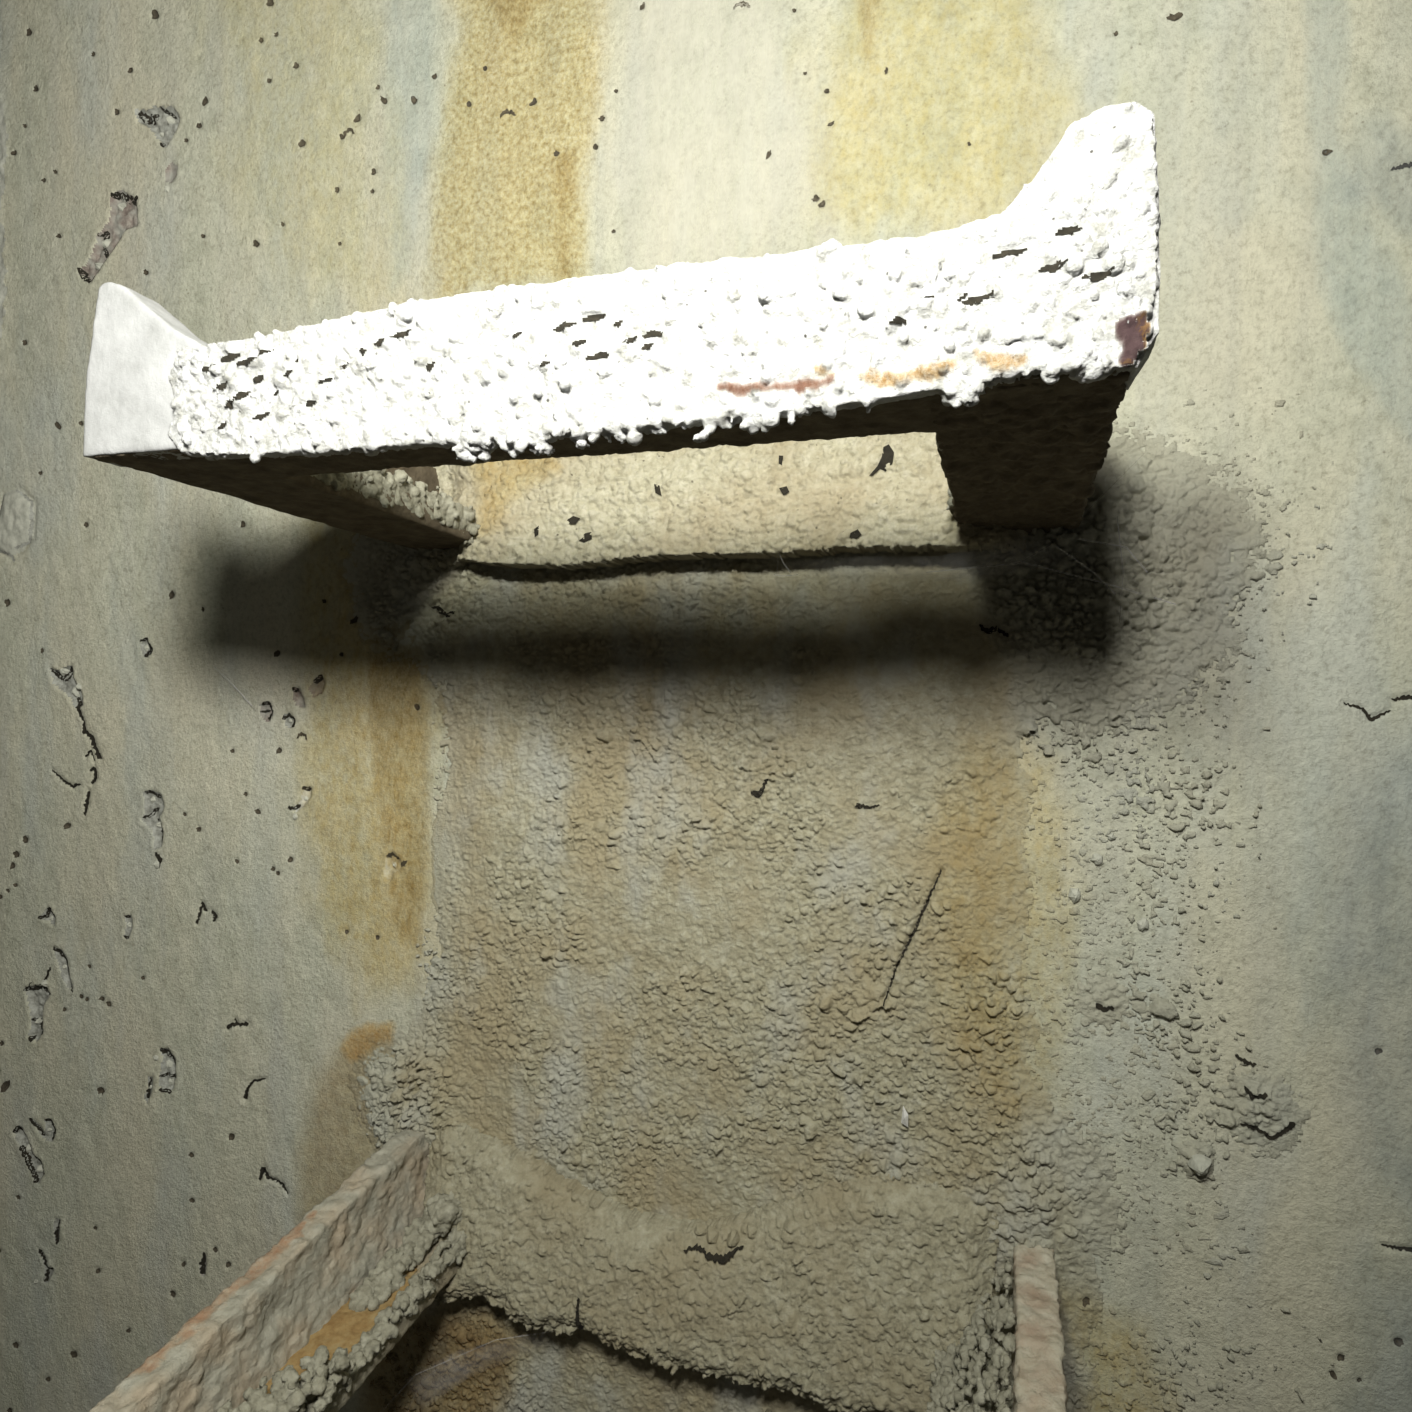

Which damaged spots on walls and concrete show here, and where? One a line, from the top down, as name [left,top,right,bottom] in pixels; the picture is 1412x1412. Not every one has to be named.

spalling [135,105,180,193]
crack [1391,161,1412,170]
spalling [77,190,138,283]
damp [168,101,1161,463]
rust [1117,314,1148,365]
crack [1343,695,1412,721]
crack [52,697,102,816]
spalling [142,790,164,869]
crack [883,870,942,1006]
spalling [23,947,73,1042]
spalling [12,1118,56,1184]
crack [1381,1244,1412,1252]